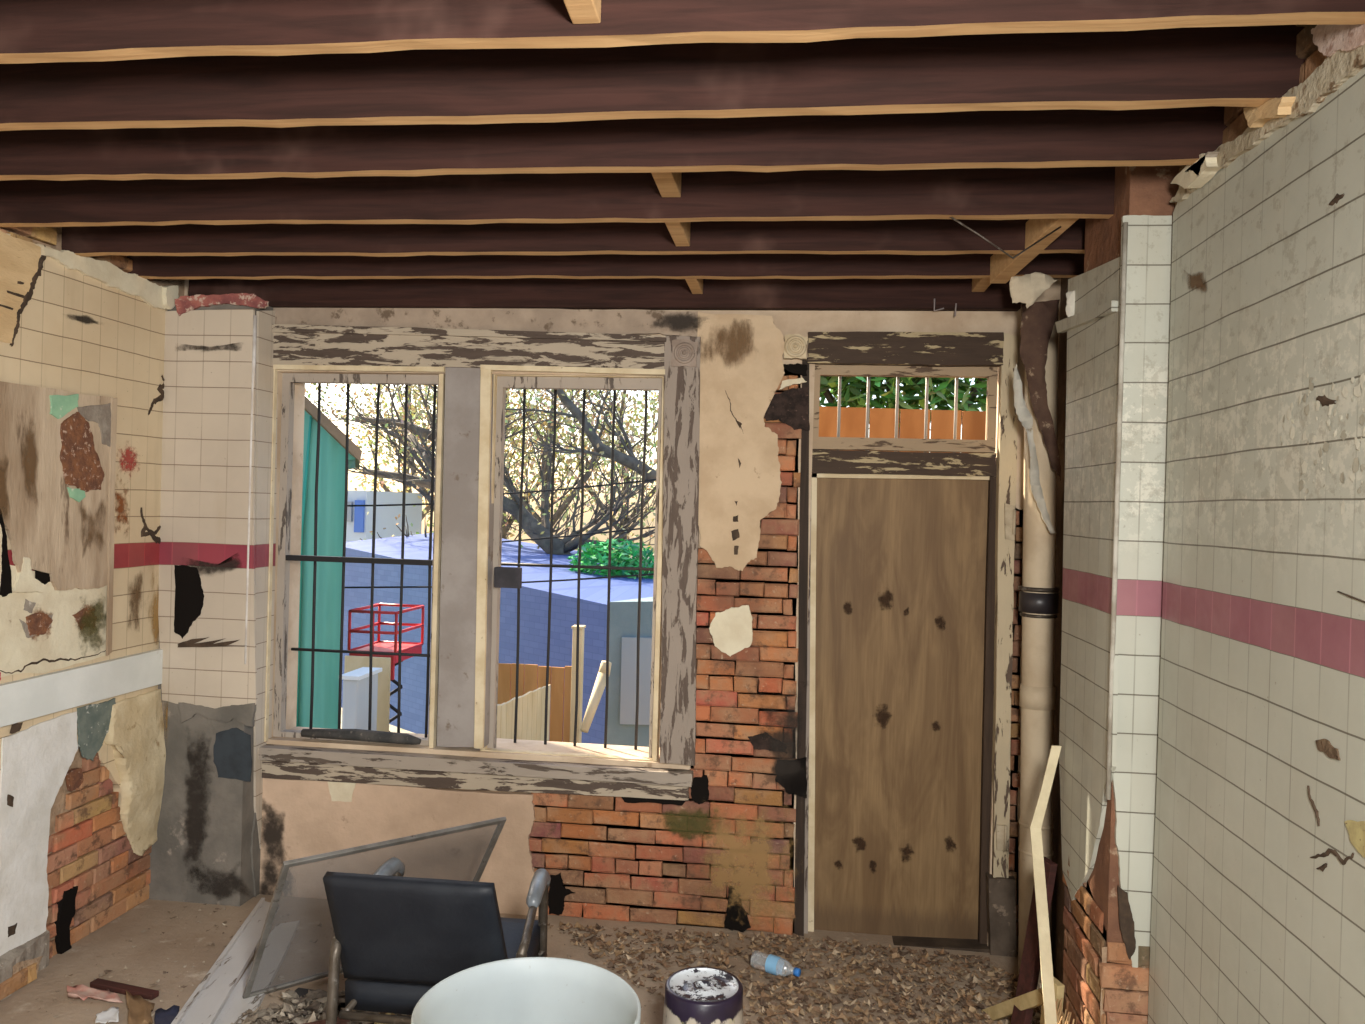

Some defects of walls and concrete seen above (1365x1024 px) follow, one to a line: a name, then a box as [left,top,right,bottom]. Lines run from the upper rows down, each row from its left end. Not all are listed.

spalling [1169,25,1365,207]
crack [10,245,46,347]
peeling [49,394,111,447]
flaking render [774,370,801,395]
peeling [67,487,86,502]
flaking render [0,565,107,677]
crack [1337,591,1365,603]
spalling [178,702,256,727]
flaking render [528,416,802,935]
leakage [185,742,248,897]
flaking render [0,752,152,1002]